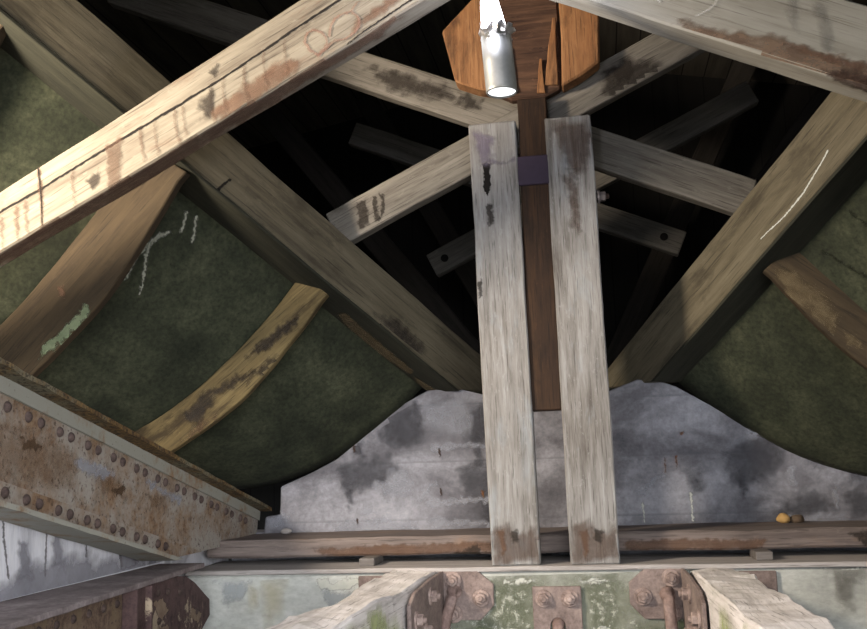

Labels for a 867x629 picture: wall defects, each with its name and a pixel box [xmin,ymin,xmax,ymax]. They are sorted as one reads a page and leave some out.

rust [20,436,42,452]
leakage [341,445,398,503]
leakage [462,409,490,518]